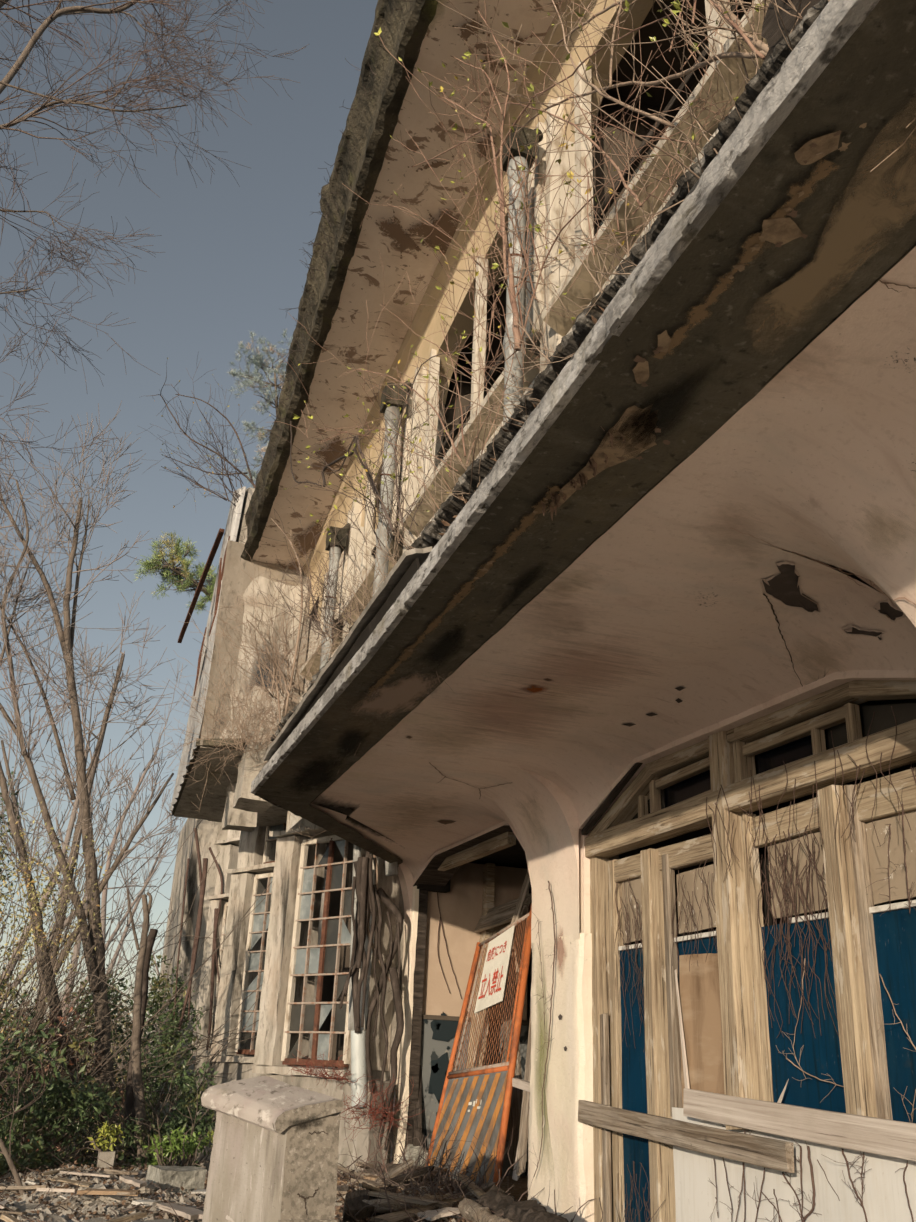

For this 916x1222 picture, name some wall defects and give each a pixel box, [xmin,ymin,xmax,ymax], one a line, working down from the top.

spalling [794,130,842,165]
spalling [761,208,808,247]
spalling [633,330,672,387]
spalling [541,404,670,520]
corrosion [368,486,561,696]
crack [763,593,803,686]
peeling [760,561,820,612]
crack [730,527,916,606]
peeling [842,599,906,640]
leakage [556,937,565,966]